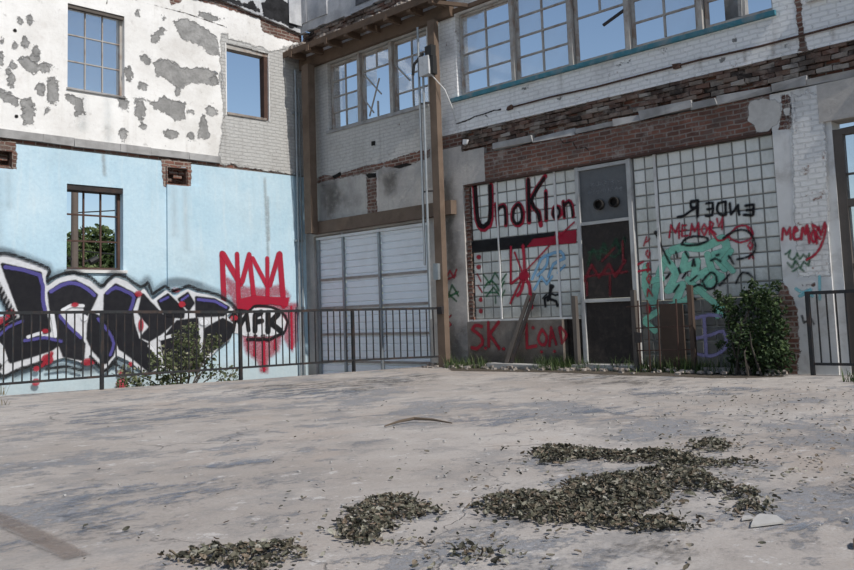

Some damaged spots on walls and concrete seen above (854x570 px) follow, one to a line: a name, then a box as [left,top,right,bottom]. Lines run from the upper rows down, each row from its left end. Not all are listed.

flaking render [0,13,86,125]
flaking render [117,0,304,176]
spalling [461,0,854,150]
flaking render [161,158,192,187]
spalling [317,149,430,213]
flaking render [778,283,801,374]